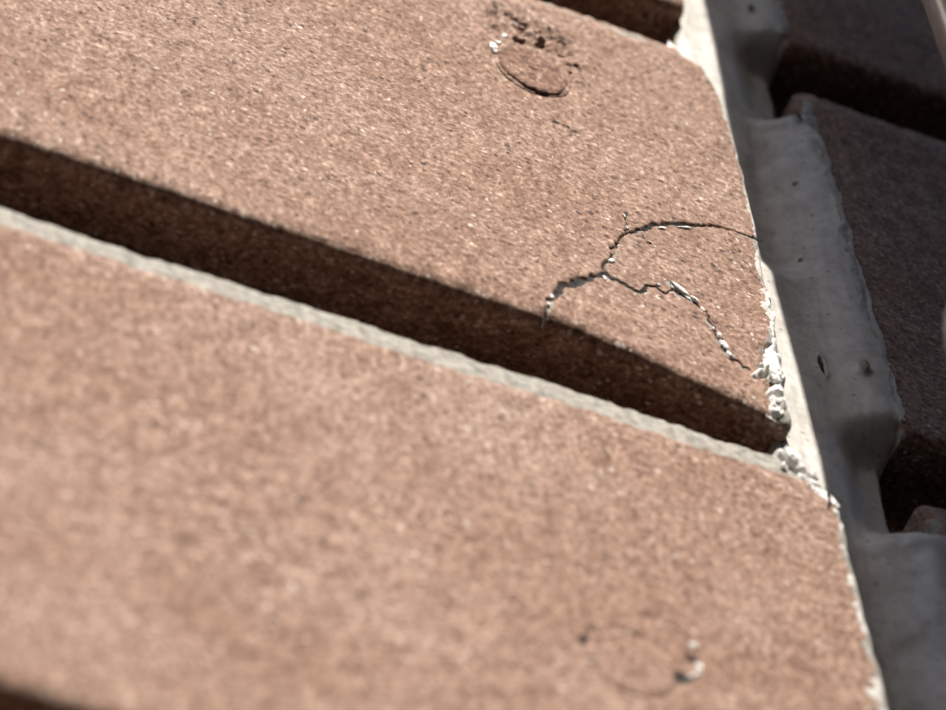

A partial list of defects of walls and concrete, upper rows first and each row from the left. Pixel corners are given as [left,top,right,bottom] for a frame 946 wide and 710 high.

spalling [490,6,580,97]
crack [538,214,762,370]